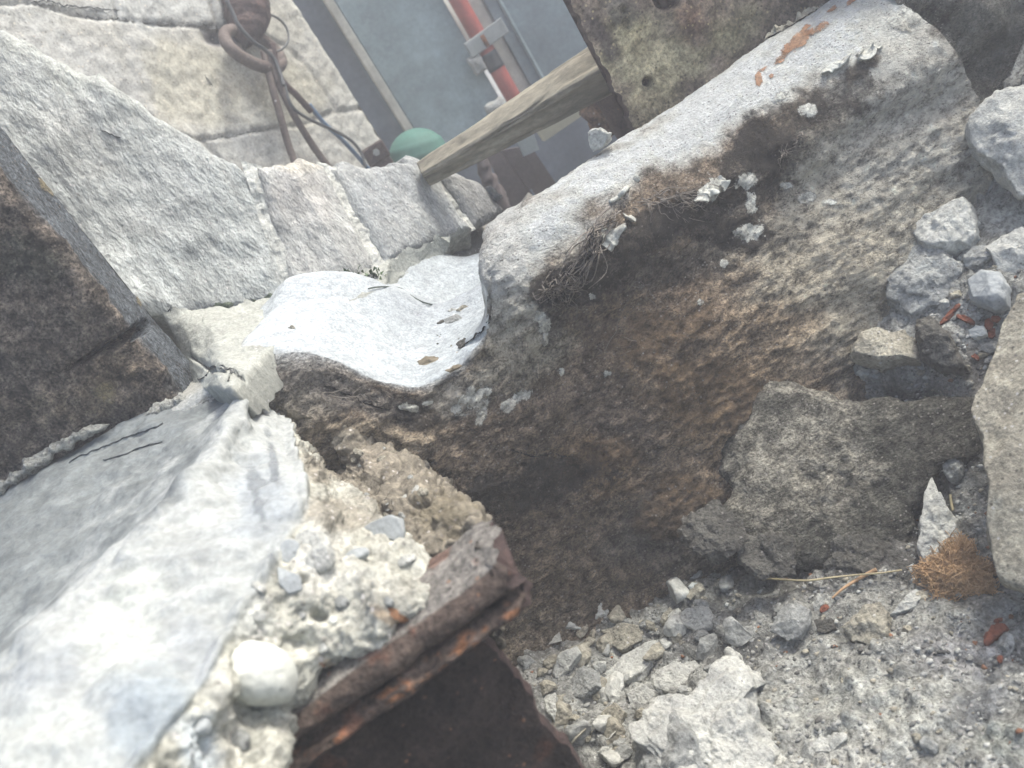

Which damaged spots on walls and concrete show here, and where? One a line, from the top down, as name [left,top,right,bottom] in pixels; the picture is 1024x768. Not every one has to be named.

corrosion [755,0,855,86]
water stain [527,54,881,315]
water stain [599,304,764,432]
water stain [392,399,448,431]
water stain [439,436,639,521]
water stain [632,472,729,541]
corrosion [387,606,409,623]